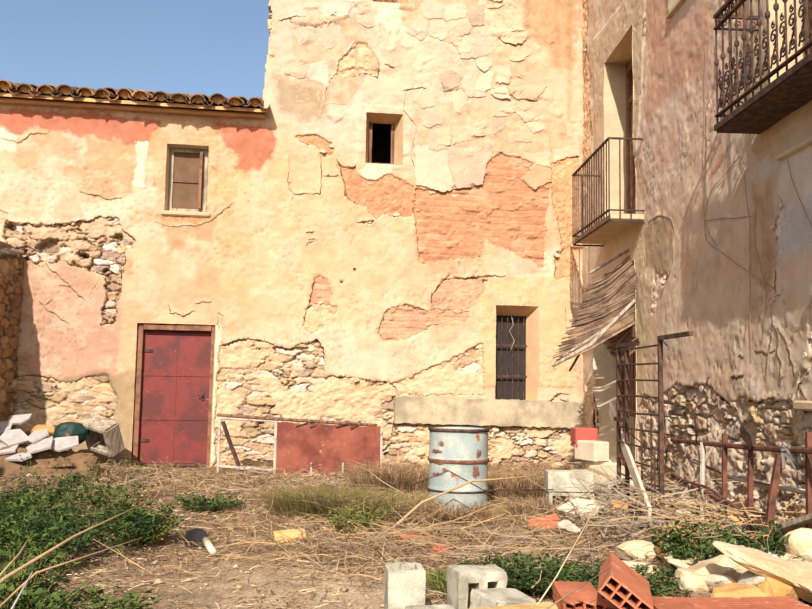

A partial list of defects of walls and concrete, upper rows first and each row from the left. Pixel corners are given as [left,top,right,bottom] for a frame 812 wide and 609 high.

peeling [283,4,381,105]
crack [0,130,49,143]
spalling [296,135,334,158]
spalling [337,0,593,280]
crack [704,45,719,184]
crack [155,201,233,227]
flaking render [3,217,135,325]
crack [731,187,812,404]
flaking render [13,374,118,438]
flaking render [213,276,485,468]
flaking render [475,426,583,468]
flaking render [637,384,812,524]